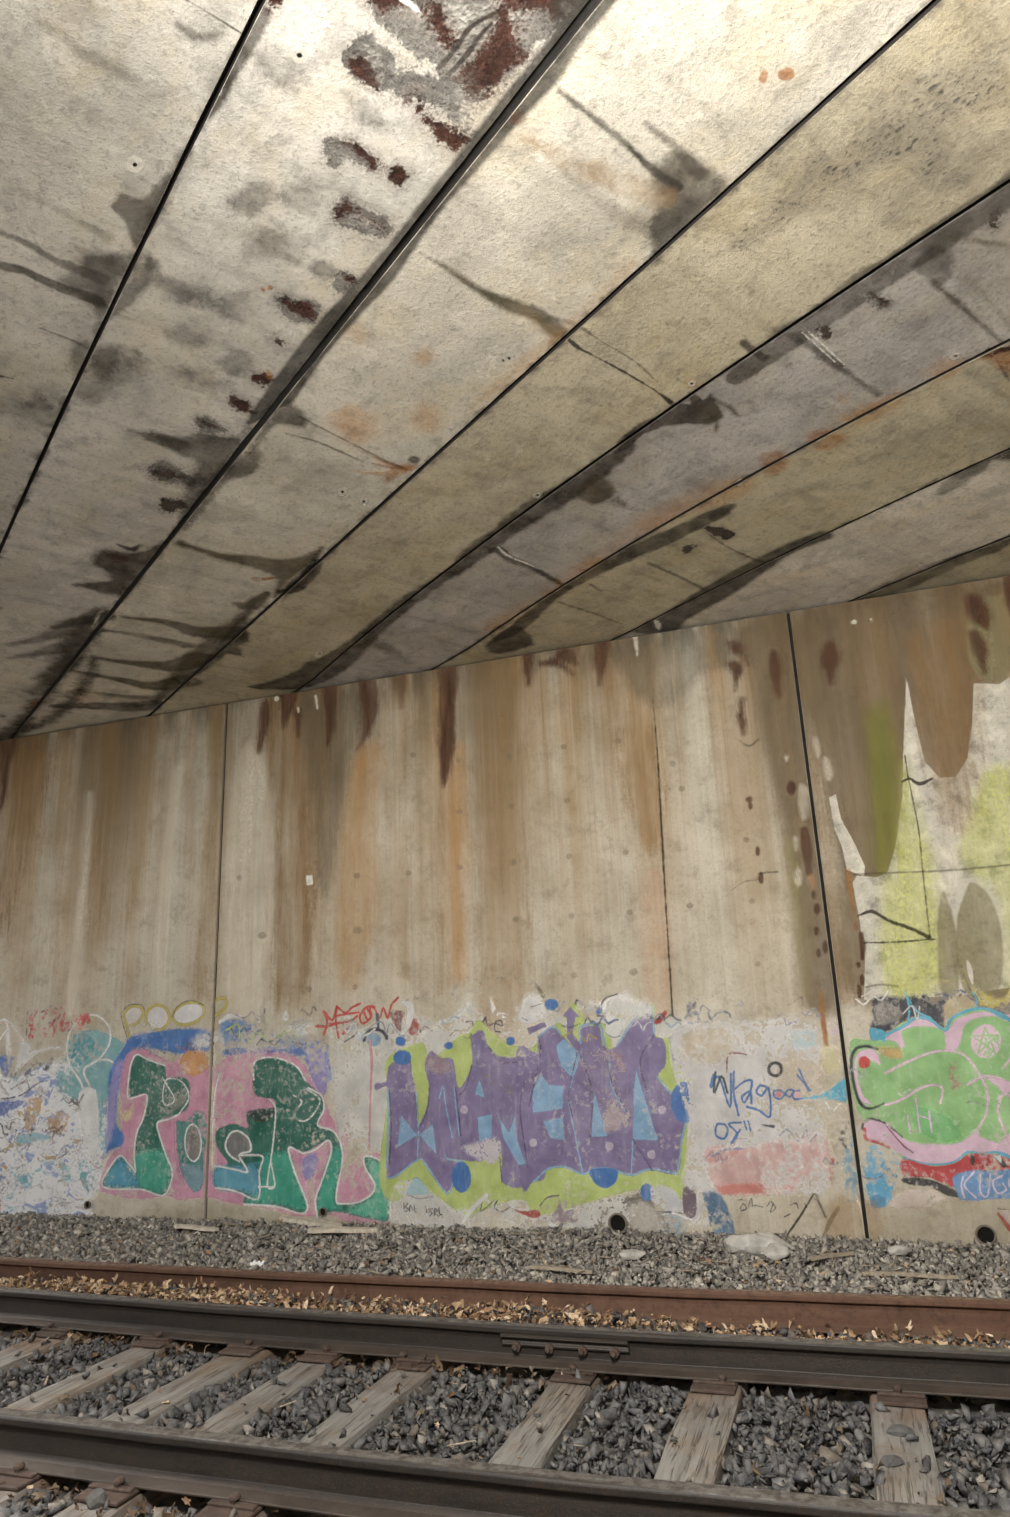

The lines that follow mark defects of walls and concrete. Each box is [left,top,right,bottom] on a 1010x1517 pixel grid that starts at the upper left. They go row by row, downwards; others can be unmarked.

leakage [210,0,283,117]
leakage [248,0,614,429]
leakage [624,143,720,248]
leakage [872,196,1010,280]
leakage [0,541,320,838]
rust [257,693,301,752]
rust [323,686,335,745]
rust [359,680,377,738]
rust [440,666,456,787]
rust [523,649,576,685]
rust [595,642,607,679]
leakage [744,539,1010,1011]